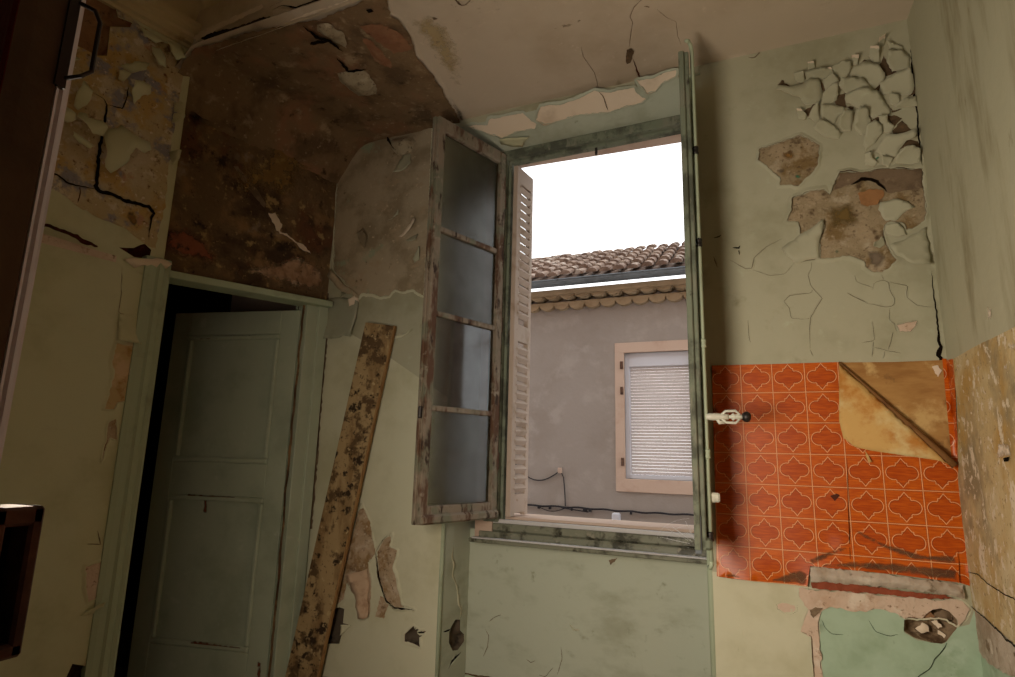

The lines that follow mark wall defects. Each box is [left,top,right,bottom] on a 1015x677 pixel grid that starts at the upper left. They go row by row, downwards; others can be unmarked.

crack [275,0,318,9]
crack [453,0,472,8]
crack [54,86,155,232]
peeling [755,34,931,277]
crack [44,224,98,247]
flaking render [52,0,679,529]
crack [712,234,943,376]
peeling [336,501,428,650]
flaking render [797,587,1015,677]
crack [971,606,1015,647]